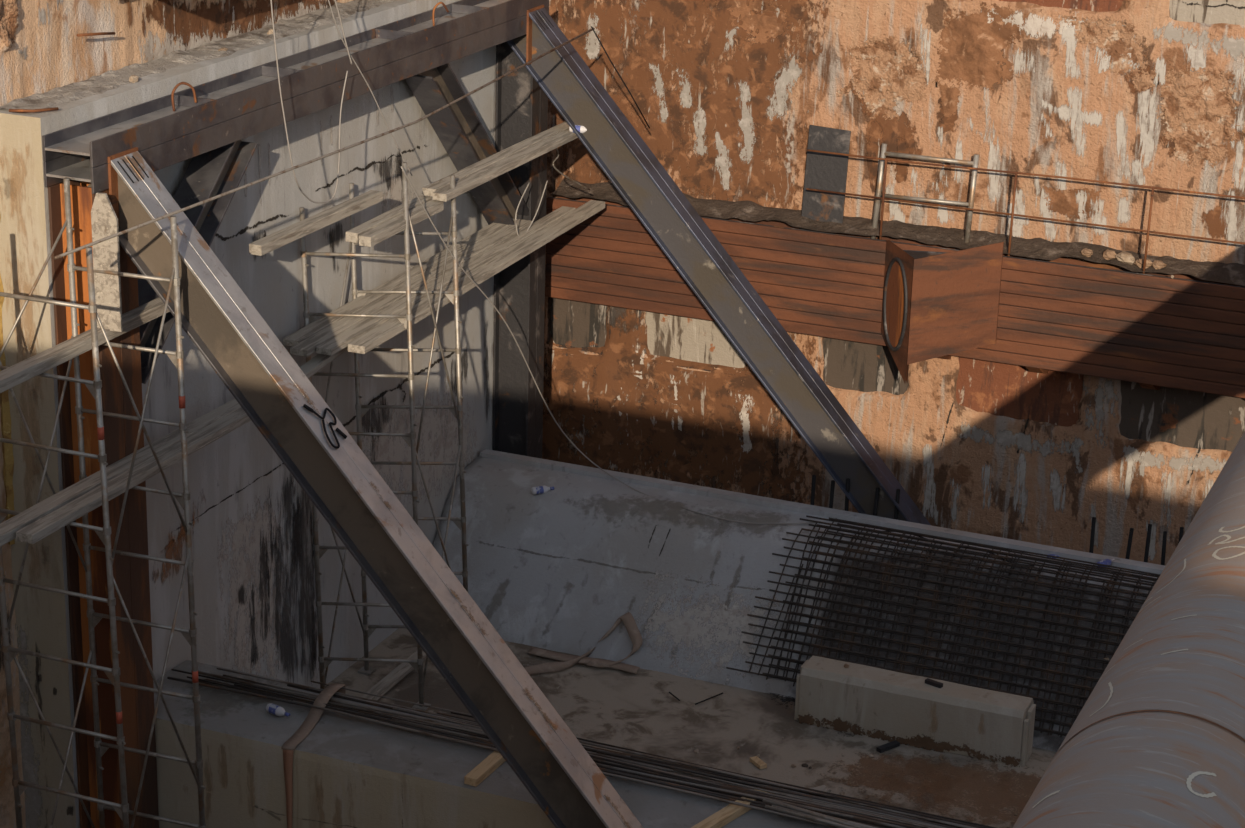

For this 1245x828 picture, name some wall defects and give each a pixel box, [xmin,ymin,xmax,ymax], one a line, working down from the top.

spalling [0,0,28,60]
damp [886,8,1166,240]
damp [1153,22,1245,246]
crack [1183,0,1245,9]
damp [218,474,318,682]